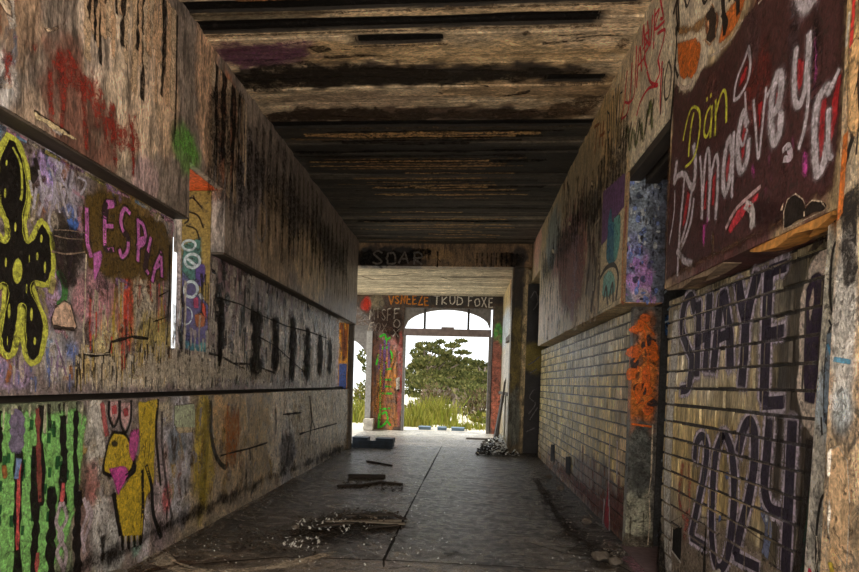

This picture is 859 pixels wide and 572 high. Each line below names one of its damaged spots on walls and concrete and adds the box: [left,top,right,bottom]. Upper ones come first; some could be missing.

water stain [207,41,604,304]
water stain [541,115,628,302]